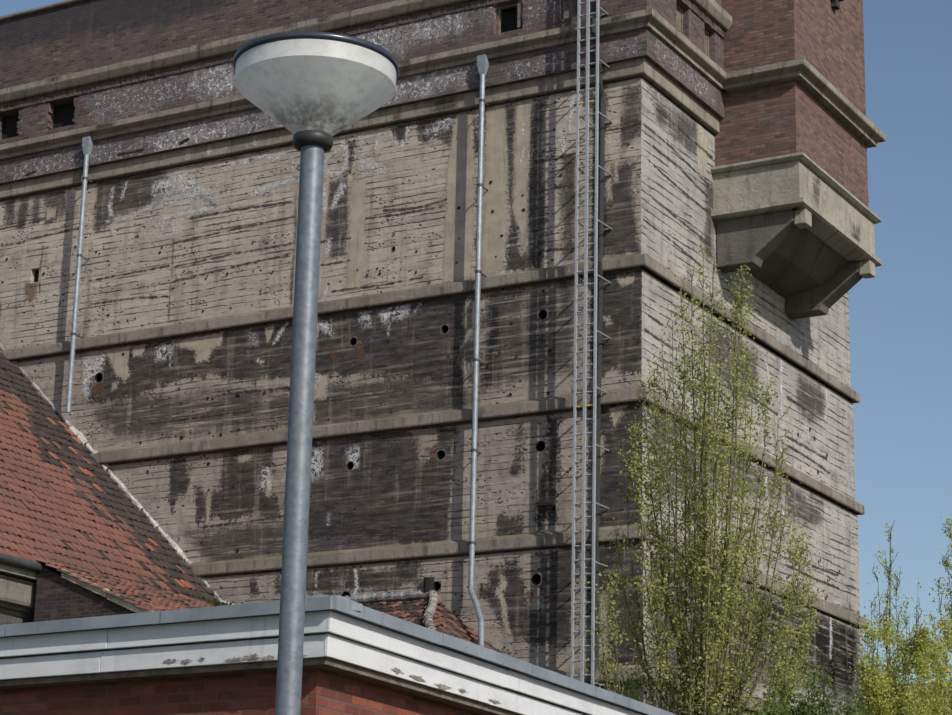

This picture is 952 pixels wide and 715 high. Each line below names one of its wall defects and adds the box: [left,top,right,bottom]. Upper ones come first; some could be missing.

leakage [3,113,299,305]
leakage [318,63,549,302]
leakage [558,91,580,259]
leakage [590,137,639,260]
peeling [105,344,146,391]
leakage [81,322,293,437]
peeling [313,375,329,420]
leakage [313,281,574,425]
leakage [589,270,642,378]
leakage [166,447,284,561]
leakage [307,426,459,553]
leakage [496,414,565,536]